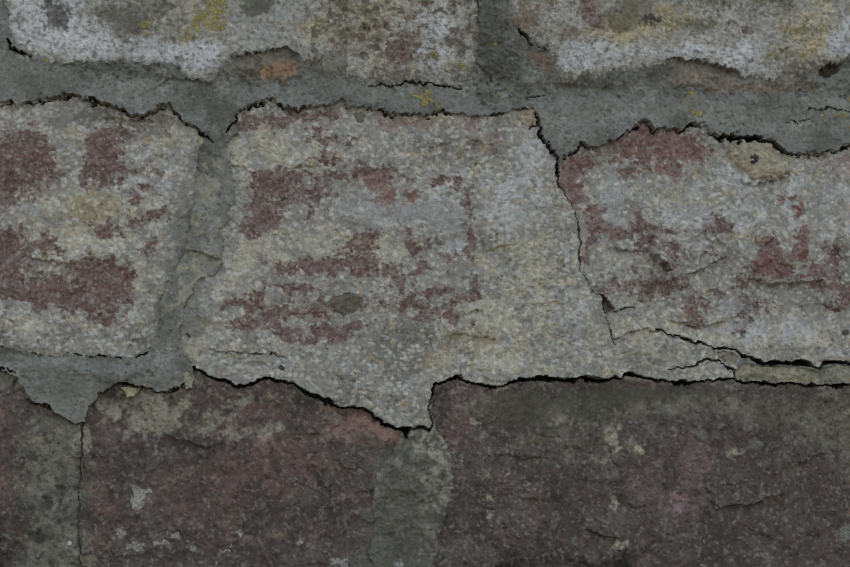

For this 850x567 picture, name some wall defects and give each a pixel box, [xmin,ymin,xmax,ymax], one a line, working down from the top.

crack [0,93,308,143]
crack [368,80,463,120]
crack [785,106,850,124]
crack [616,122,850,159]
crack [489,94,636,345]
crack [0,345,16,374]
crack [73,351,149,359]
crack [26,398,51,410]
peeling [120,386,141,399]
peeling [182,371,195,390]
crack [97,328,850,433]
spalling [317,401,405,446]